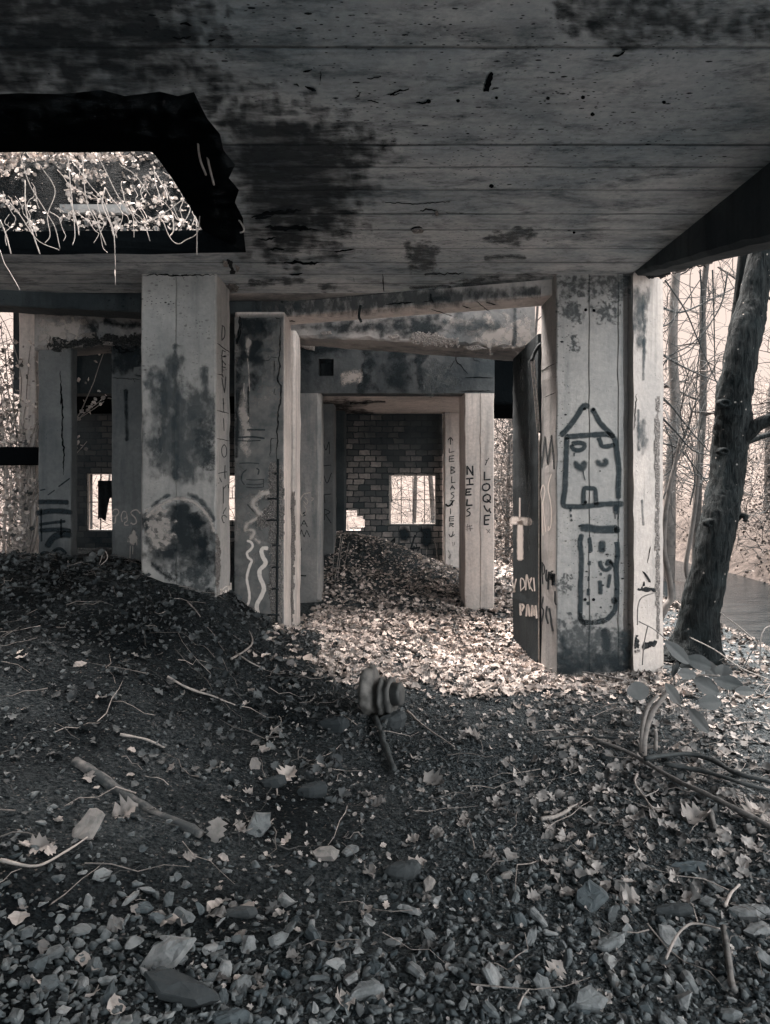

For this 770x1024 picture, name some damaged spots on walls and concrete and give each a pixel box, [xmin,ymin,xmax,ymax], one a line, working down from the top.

water stain [0,0,388,286]
water stain [484,226,536,260]
water stain [557,275,631,303]
crack [47,335,65,475]
water stain [111,344,215,483]
water stain [235,243,543,551]
water stain [142,497,215,581]